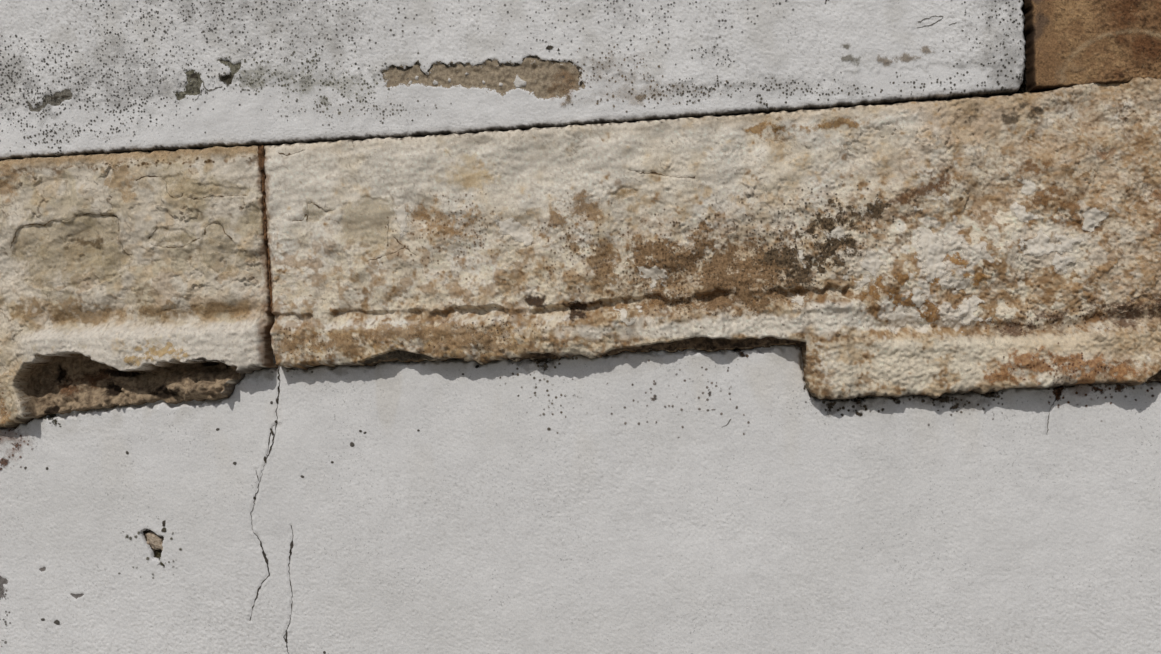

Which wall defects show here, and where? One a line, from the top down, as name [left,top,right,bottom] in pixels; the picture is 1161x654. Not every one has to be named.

flaking render [173,59,241,100]
flaking render [380,45,586,100]
spalling [15,352,241,419]
crack [249,366,293,652]
flaking render [123,520,182,579]
flaking render [0,576,11,625]